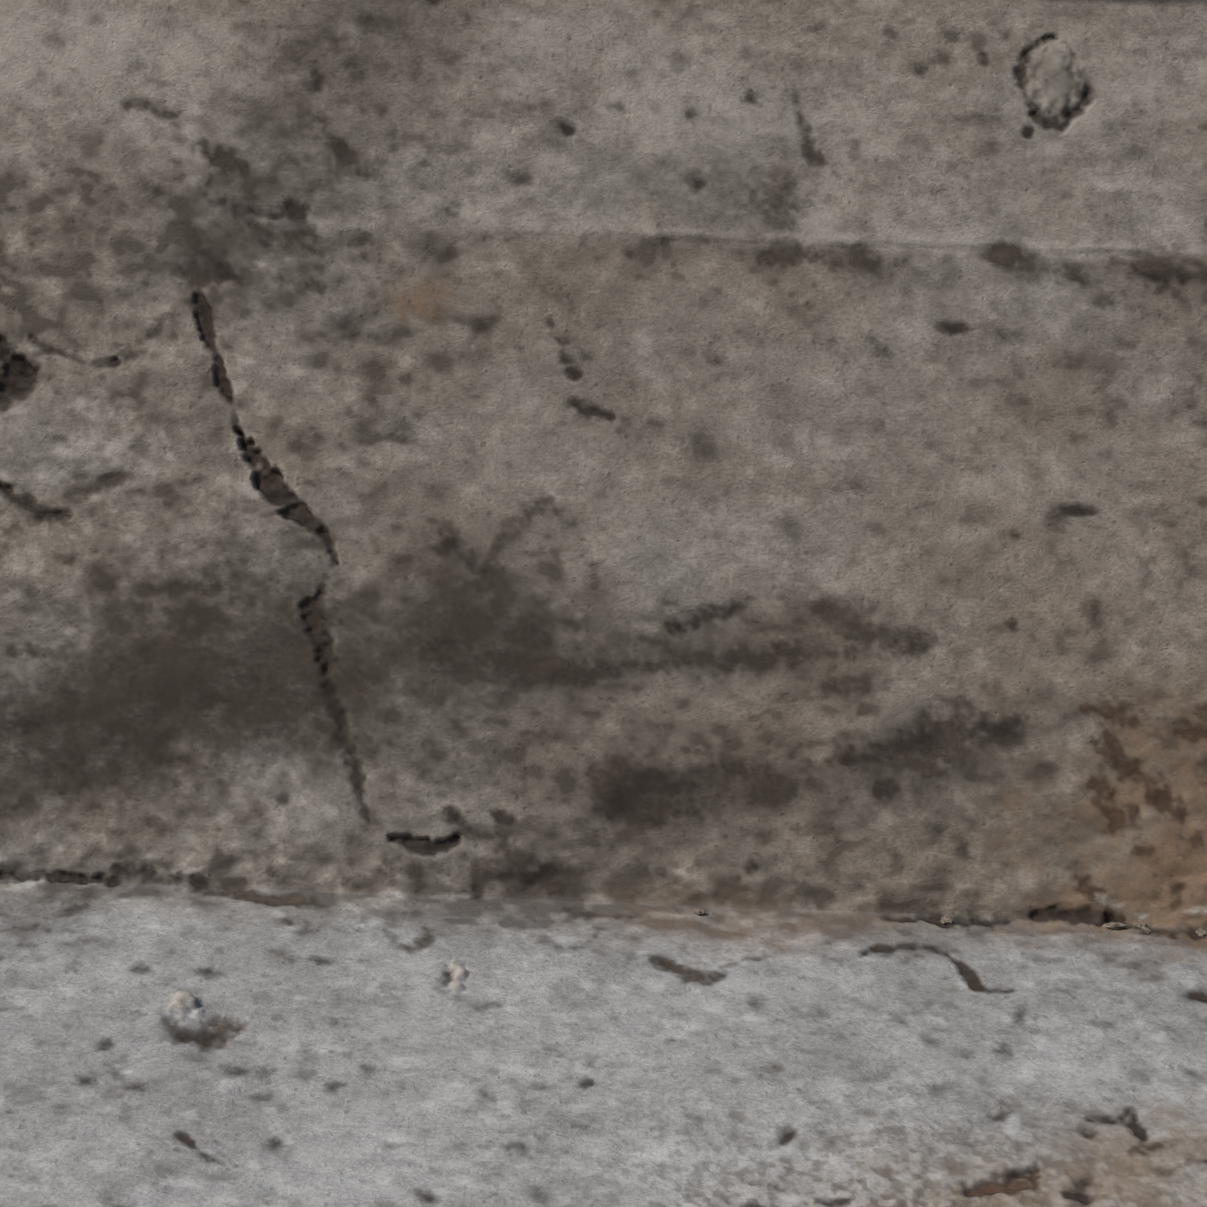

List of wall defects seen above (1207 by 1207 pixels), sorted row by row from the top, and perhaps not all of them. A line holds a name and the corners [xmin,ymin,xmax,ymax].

spalling [1015,35,1056,88]
spalling [1022,69,1091,138]
crack [30,324,161,367]
crack [195,294,369,820]
damp [666,603,740,632]
damp [827,700,1016,778]
damp [585,757,705,824]
rust [1062,703,1207,937]
crack [861,907,1203,992]